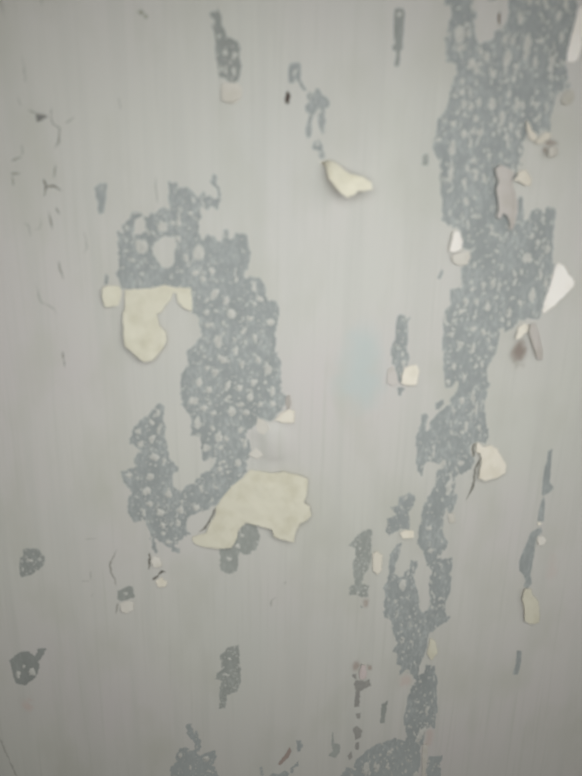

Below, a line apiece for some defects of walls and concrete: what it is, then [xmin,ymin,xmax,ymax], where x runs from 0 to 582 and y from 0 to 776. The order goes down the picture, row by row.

peeling [209,8,242,103]
peeling [288,62,373,197]
peeling [102,173,311,574]
peeling [328,0,582,776]
peeling [19,548,45,577]
peeling [9,648,46,685]
peeling [215,645,241,709]
peeling [170,724,218,776]
peeling [260,740,303,776]